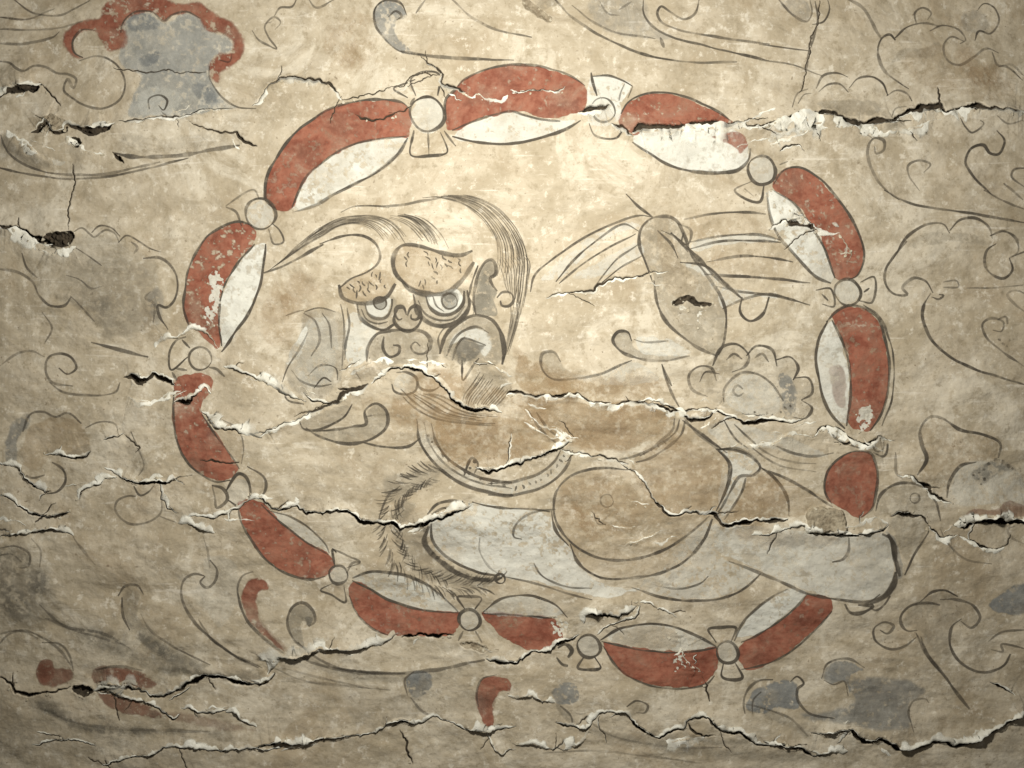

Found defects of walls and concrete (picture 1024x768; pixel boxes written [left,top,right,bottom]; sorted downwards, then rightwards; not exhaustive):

crack [0,4,1024,258]
spalling [41,230,75,248]
spalling [671,295,714,329]
crack [0,433,472,536]
crack [123,324,1024,554]
crack [0,598,1024,768]